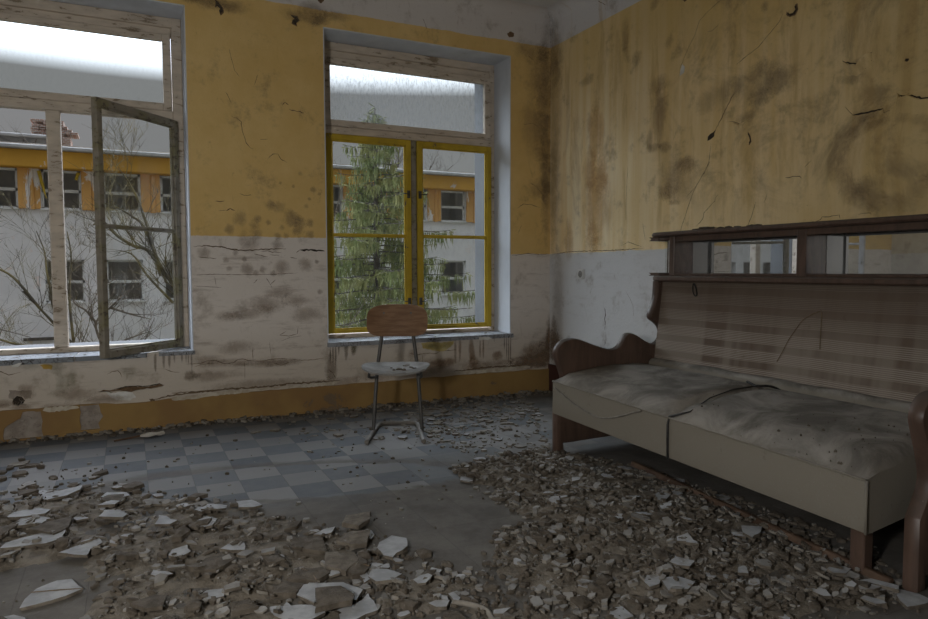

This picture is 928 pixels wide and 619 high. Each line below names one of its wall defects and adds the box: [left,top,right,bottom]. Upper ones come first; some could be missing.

crack [846,108,887,116]
water stain [515,320,558,367]